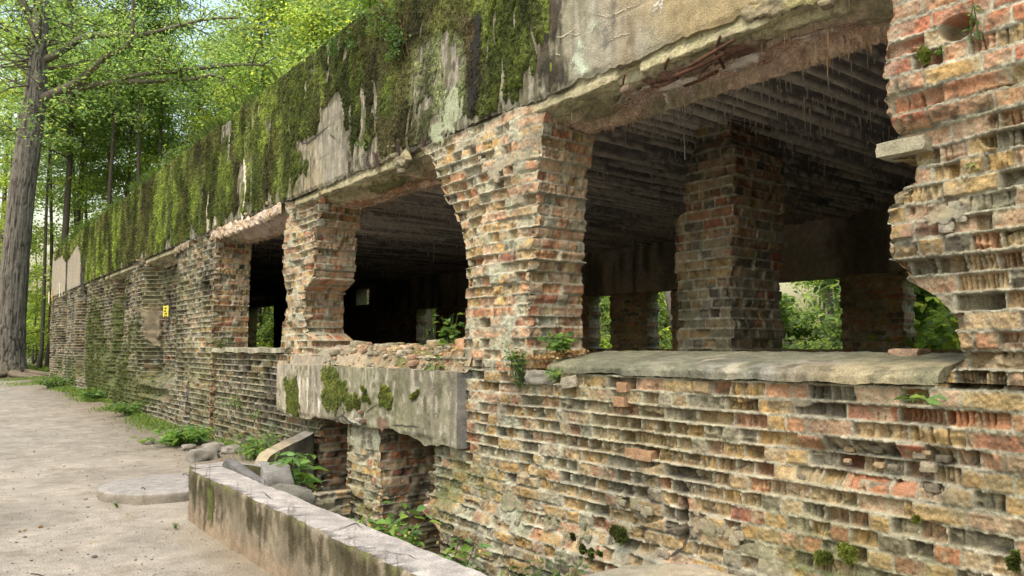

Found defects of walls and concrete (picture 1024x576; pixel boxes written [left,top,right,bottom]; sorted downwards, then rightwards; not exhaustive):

damp [619,75,700,103]
damp [721,53,761,72]
corrosion [612,23,875,119]
damp [240,160,287,240]
damp [348,151,410,196]
flaking render [923,201,968,234]
damp [187,464,223,531]
damp [237,489,267,543]
damp [281,507,323,571]
damp [335,536,399,576]